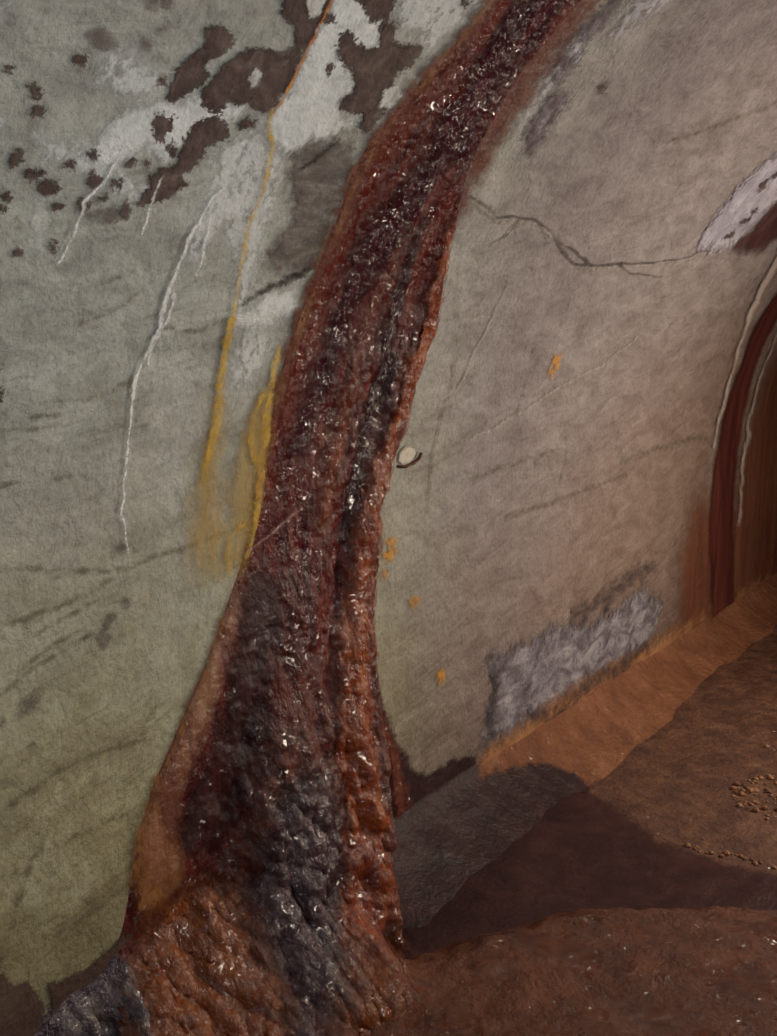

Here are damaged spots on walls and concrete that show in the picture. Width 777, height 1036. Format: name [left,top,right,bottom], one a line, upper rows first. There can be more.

peeling [0,190,14,215]
water stain [43,47,244,195]
peeling [7,0,423,224]
water stain [189,0,383,387]
water stain [393,0,480,51]
crack [471,195,709,276]
corrosion [117,0,601,1036]
water stain [381,609,714,932]